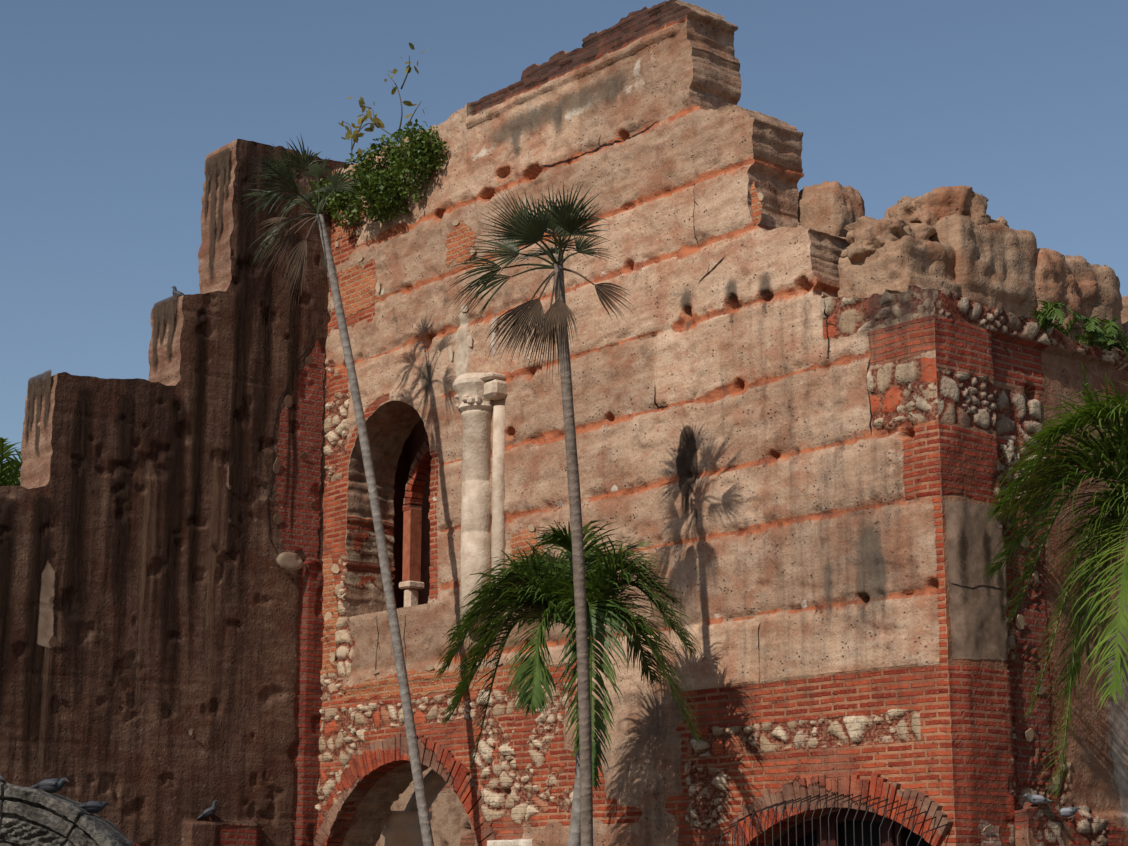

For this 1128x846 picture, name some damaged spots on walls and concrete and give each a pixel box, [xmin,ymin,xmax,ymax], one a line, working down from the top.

leakage [25,370,51,454]
leakage [114,394,134,585]
leakage [152,295,178,370]
leakage [161,308,207,703]
leakage [204,148,278,547]
leakage [286,231,302,525]
leakage [676,426,698,522]
leakage [959,533,968,599]
leakage [983,531,1003,613]
peeling [1106,585,1128,826]